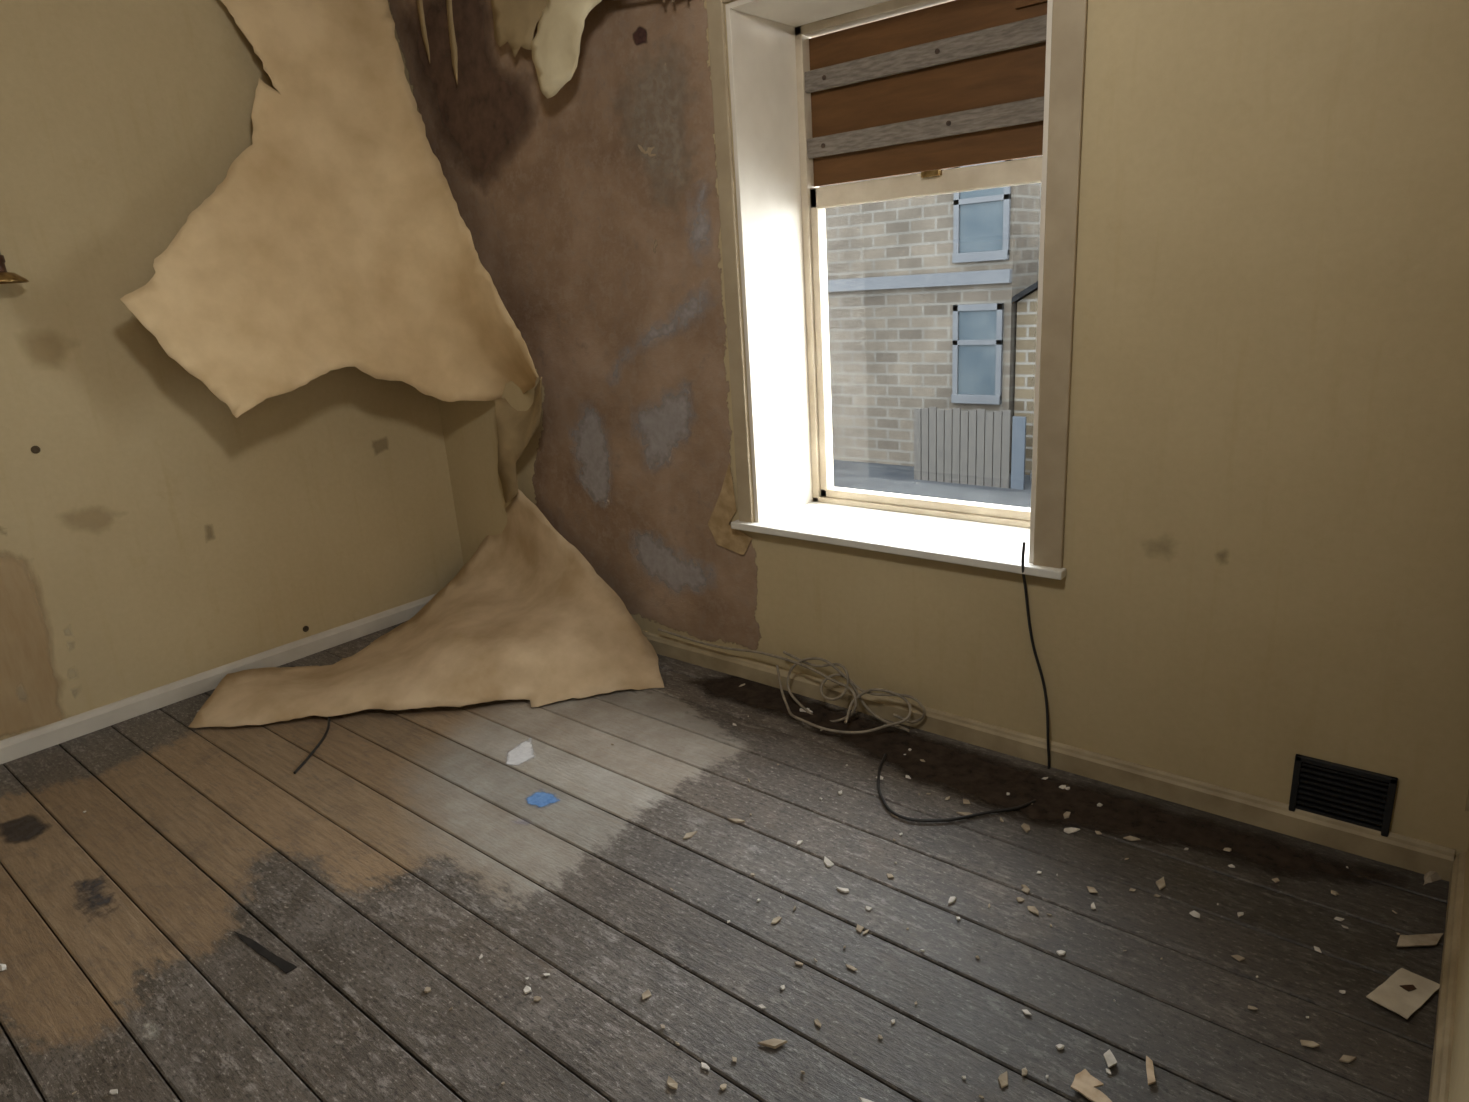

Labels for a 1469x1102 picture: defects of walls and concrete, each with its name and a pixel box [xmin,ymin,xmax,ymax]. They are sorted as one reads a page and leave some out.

peeling [0,556,62,737]
flaking render [388,0,762,650]